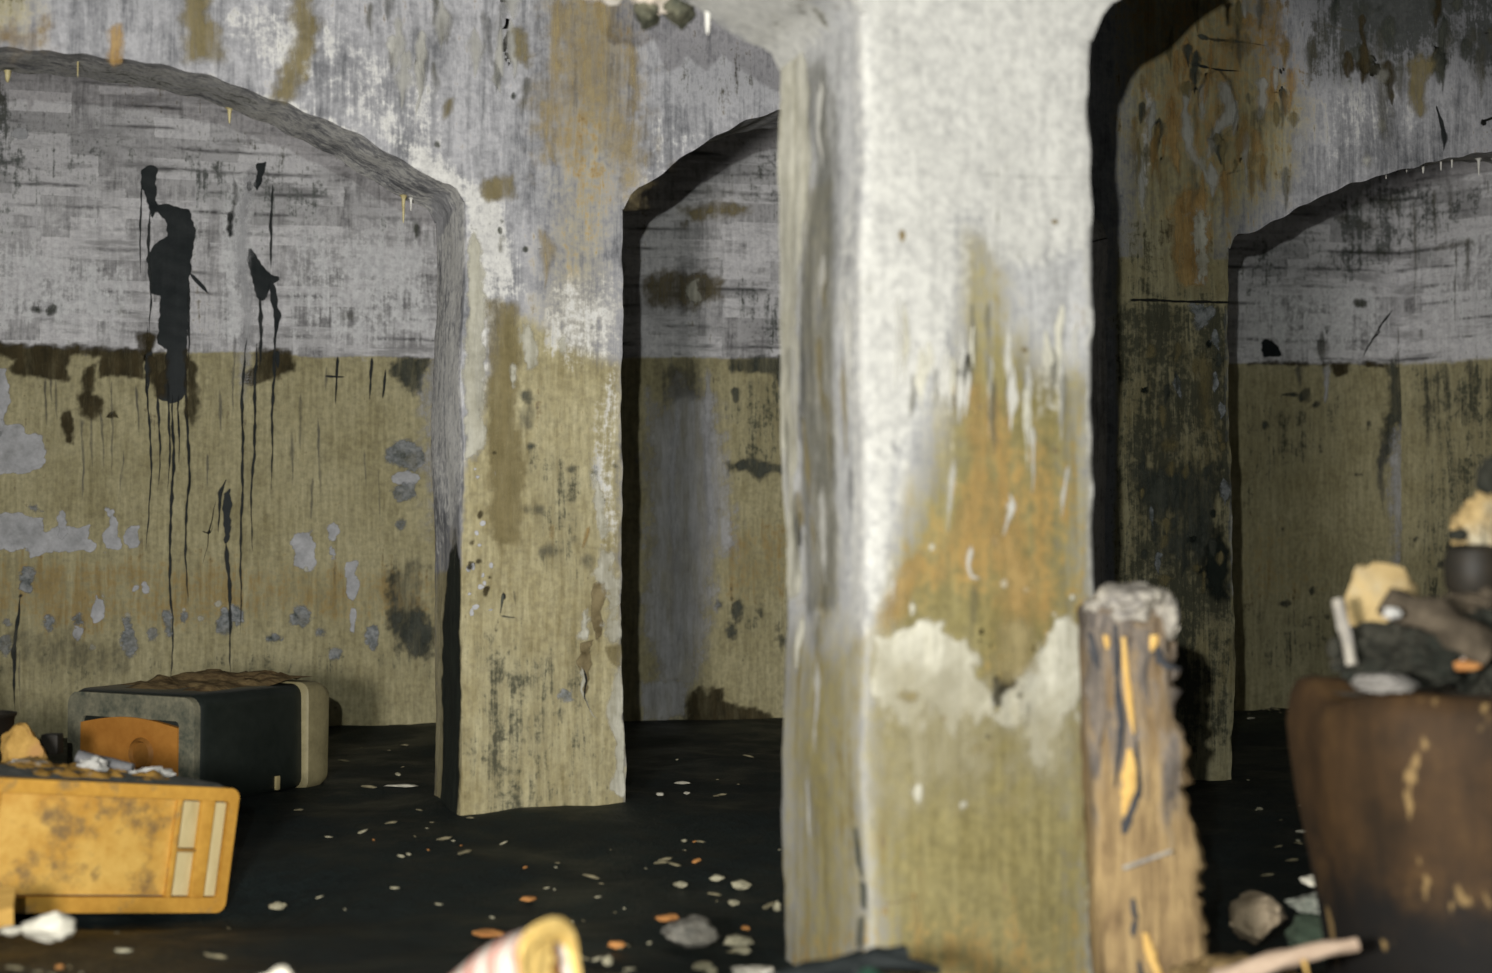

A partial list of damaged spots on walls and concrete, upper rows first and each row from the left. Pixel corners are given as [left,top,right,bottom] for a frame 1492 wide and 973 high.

corrosion [1167,0,1262,102]
corrosion [1271,39,1297,127]
corrosion [1133,102,1166,208]
corrosion [1174,101,1265,286]
peeling [0,368,46,474]
leakage [0,185,209,671]
leakage [218,173,295,672]
leakage [369,358,434,412]
leakage [1131,303,1231,601]
peeling [0,505,140,593]
leakage [11,599,20,707]
leakage [388,544,461,814]